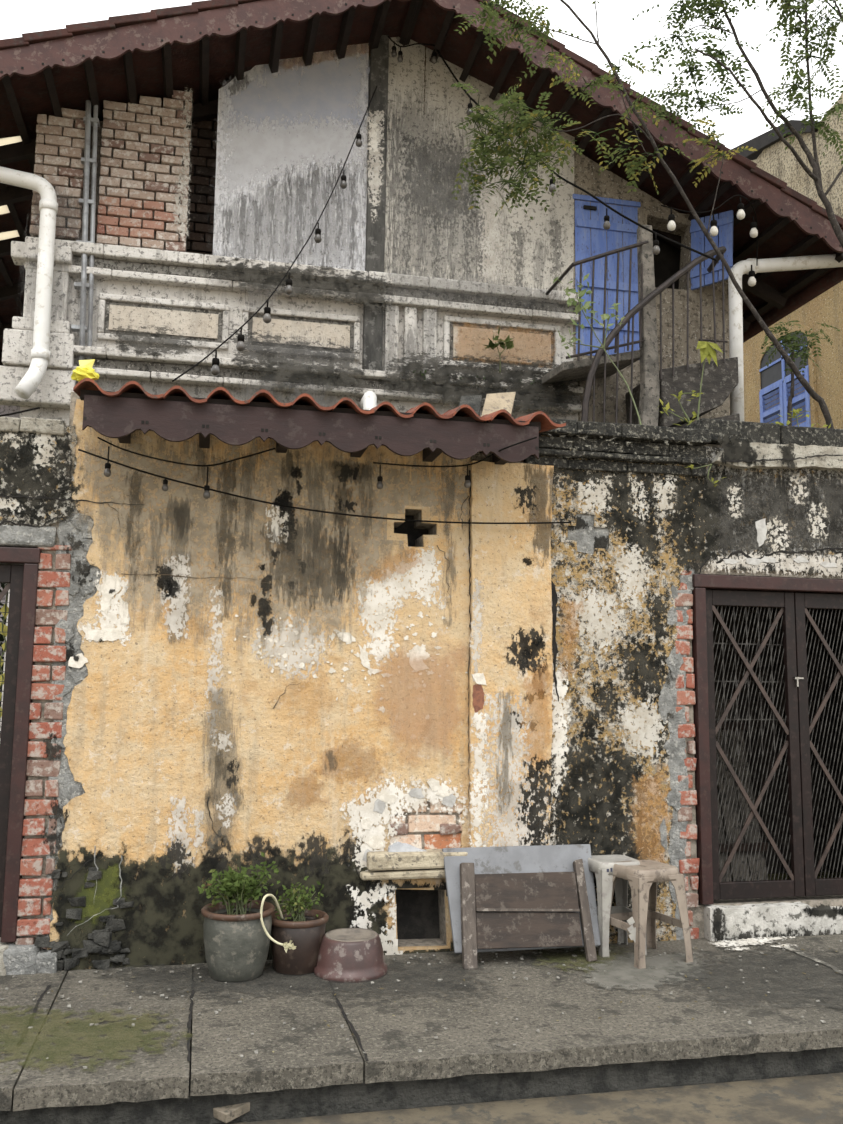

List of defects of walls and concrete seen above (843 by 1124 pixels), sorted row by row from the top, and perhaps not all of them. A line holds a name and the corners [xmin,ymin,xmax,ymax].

leakage [218,109,384,223]
leakage [112,325,196,358]
leakage [229,329,365,394]
spalling [728,484,743,518]
spalling [790,474,828,539]
flaking render [15,502,134,971]
leakage [0,421,469,973]
peeling [234,546,450,713]
leakage [384,351,843,860]
spalling [658,516,843,940]
peeling [340,777,468,955]